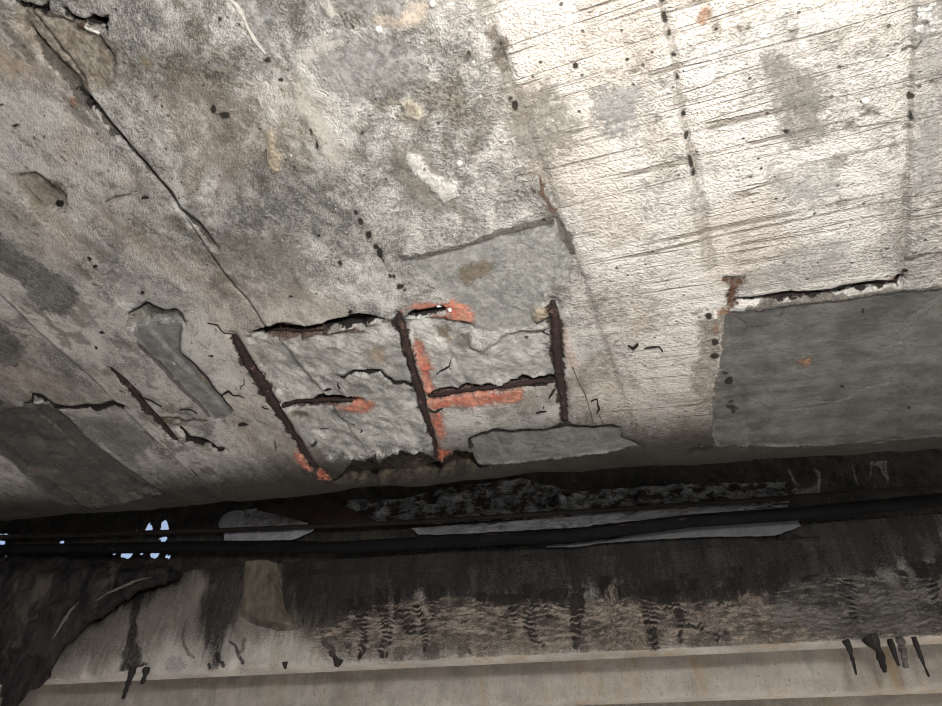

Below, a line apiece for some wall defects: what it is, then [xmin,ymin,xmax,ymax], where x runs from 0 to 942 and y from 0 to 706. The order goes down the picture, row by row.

crack [35,32,215,244]
rust [263,324,368,341]
crack [731,251,942,336]
crack [24,389,225,452]
crack [221,379,269,427]
rust [231,333,376,480]
spalling [246,314,554,484]
rust [395,299,575,462]
water stain [310,572,942,660]